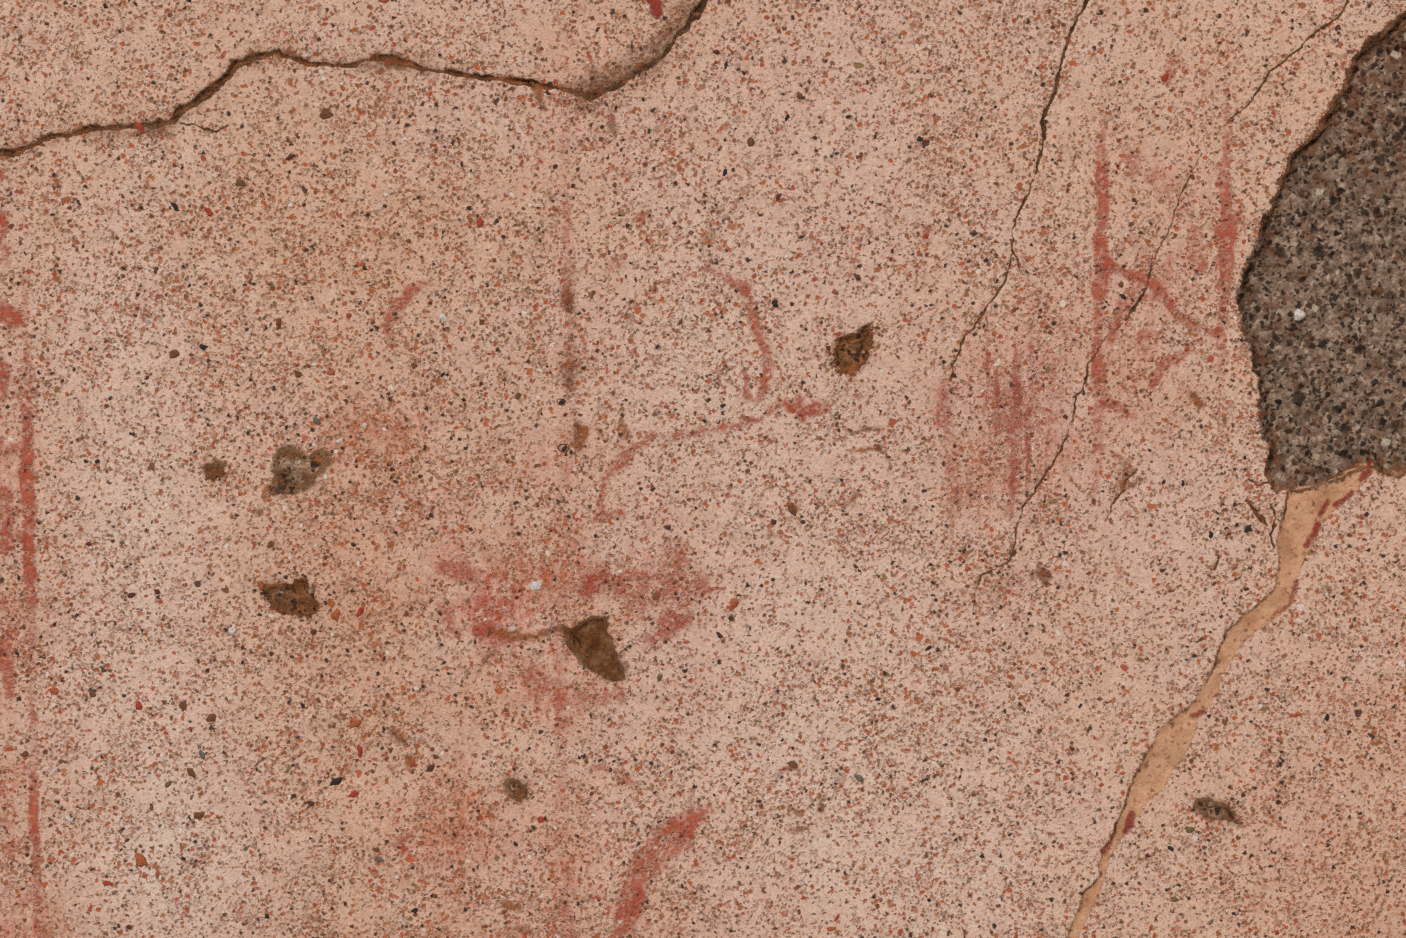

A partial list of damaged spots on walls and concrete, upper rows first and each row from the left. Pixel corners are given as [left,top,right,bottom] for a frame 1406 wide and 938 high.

crack [0,0,707,157]
crack [950,0,1088,381]
crack [973,0,1348,614]
spalling [1236,11,1406,494]
crack [1067,461,1375,938]